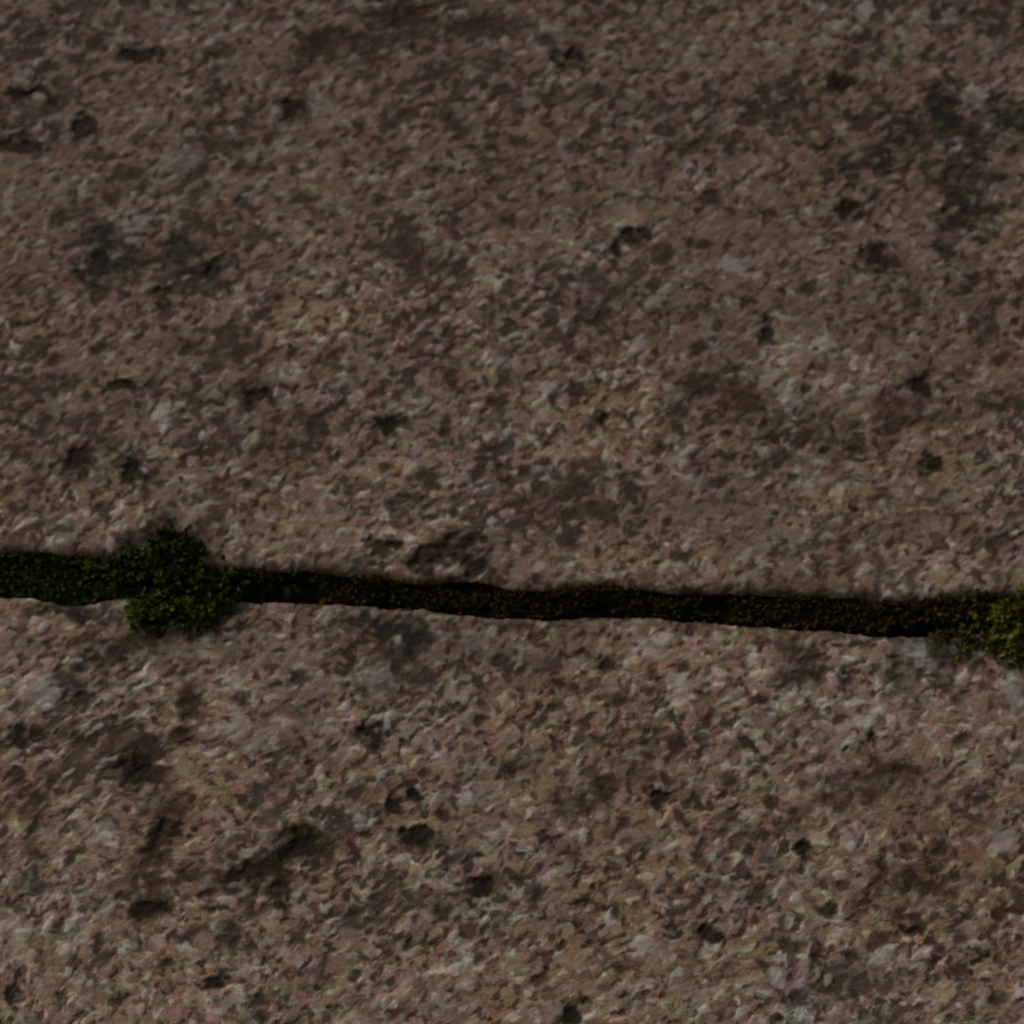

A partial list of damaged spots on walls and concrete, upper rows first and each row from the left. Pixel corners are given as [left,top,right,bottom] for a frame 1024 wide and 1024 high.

crack [0,549,1024,639]